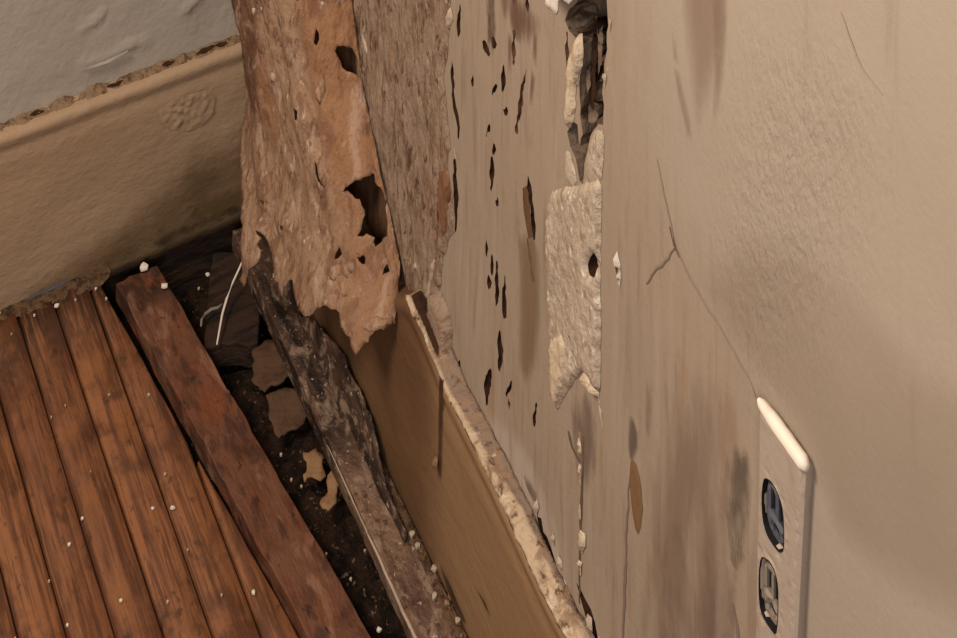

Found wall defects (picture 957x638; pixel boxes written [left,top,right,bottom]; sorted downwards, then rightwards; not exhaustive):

peeling [231,0,603,638]
spalling [613,252,621,287]
crack [646,159,756,397]
damp [726,452,746,525]